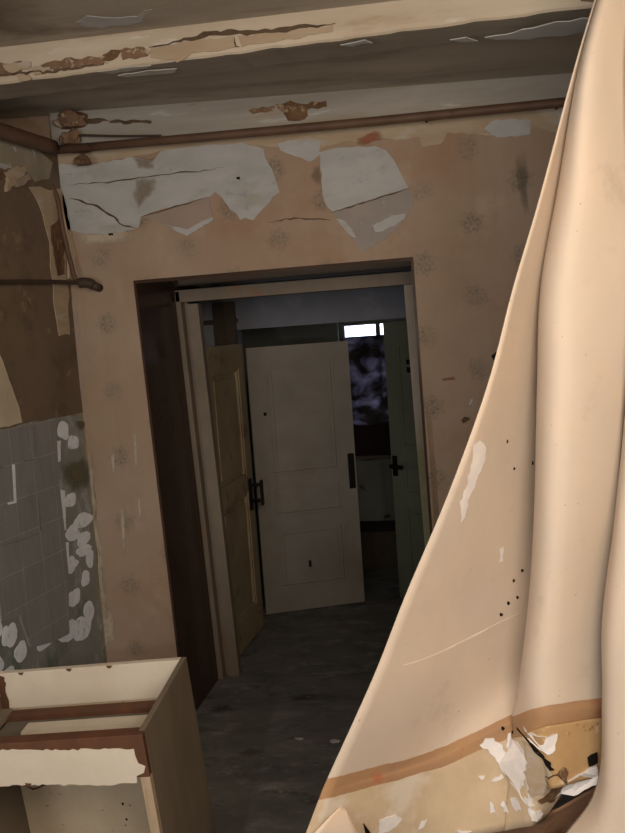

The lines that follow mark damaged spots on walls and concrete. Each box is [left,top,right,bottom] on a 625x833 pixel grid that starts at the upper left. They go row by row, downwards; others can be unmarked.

peeling [450,18,589,42]
flaking render [0,47,177,82]
flaking render [248,101,327,121]
peeling [0,107,563,398]
flaking render [0,356,22,428]